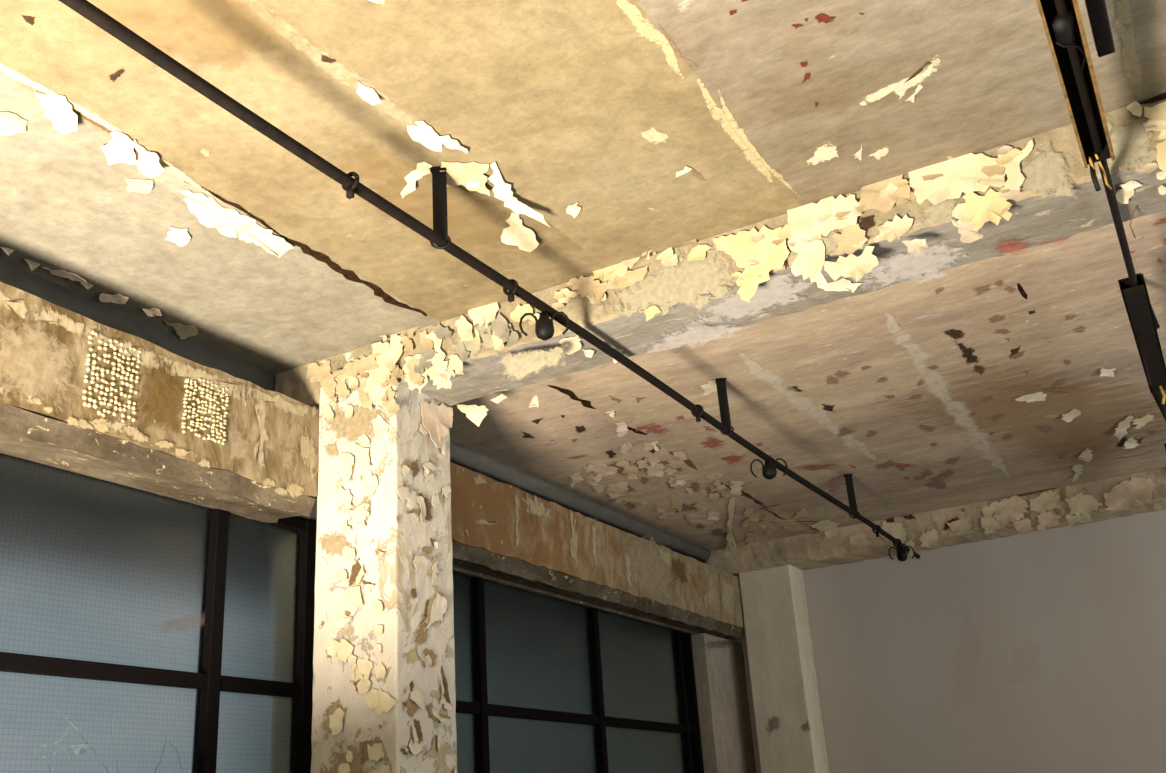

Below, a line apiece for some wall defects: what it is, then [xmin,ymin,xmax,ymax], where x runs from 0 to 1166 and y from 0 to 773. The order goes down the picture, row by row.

peeling [34,91,77,134]
peeling [356,81,382,106]
peeling [101,131,166,194]
peeling [1097,101,1166,204]
peeling [1,247,129,304]
peeling [166,190,294,258]
crack [184,181,428,317]
peeling [142,308,198,339]
peeling [27,398,53,414]
peeling [66,416,210,468]
peeling [306,121,1154,773]
peeling [263,478,304,499]